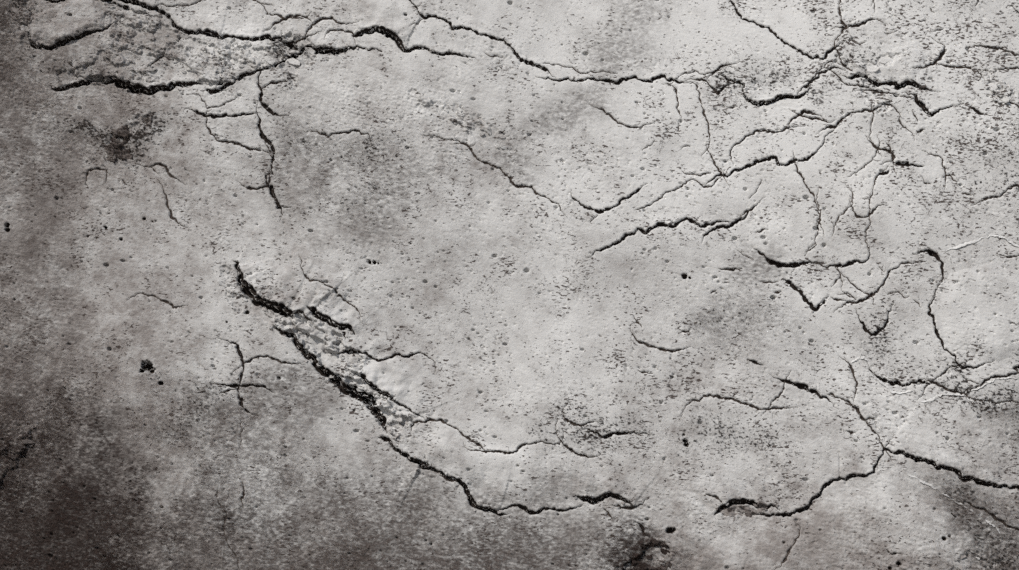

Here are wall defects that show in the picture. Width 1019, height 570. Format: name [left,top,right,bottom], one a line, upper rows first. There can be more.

spalling [47,2,317,91]
spalling [218,268,251,323]
spalling [262,308,411,440]
crack [219,256,652,538]
crack [29,0,1019,405]
crack [681,359,1019,570]